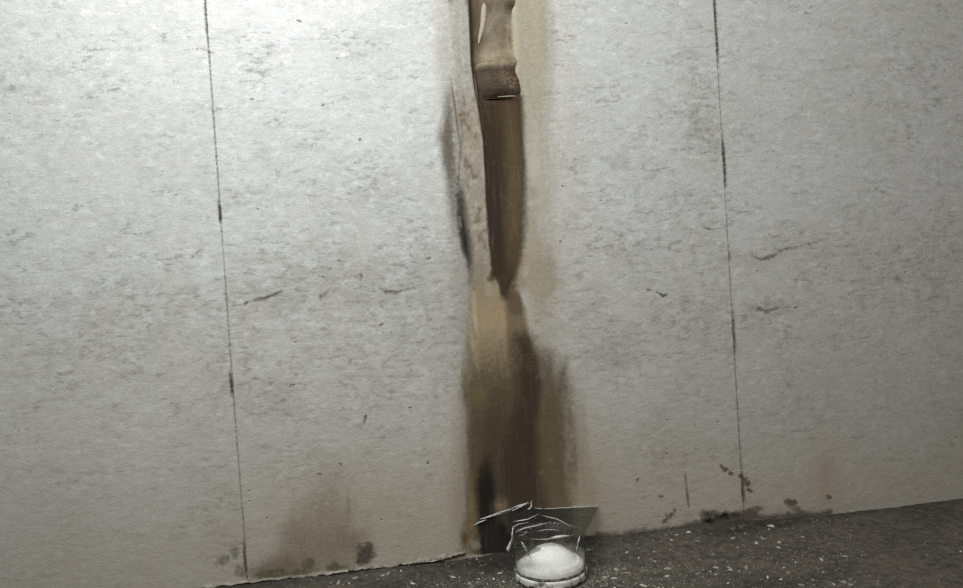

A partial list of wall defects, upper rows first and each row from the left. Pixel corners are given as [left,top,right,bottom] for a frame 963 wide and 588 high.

leakage [441,0,832,554]
leakage [357,543,373,564]
leakage [258,556,341,577]